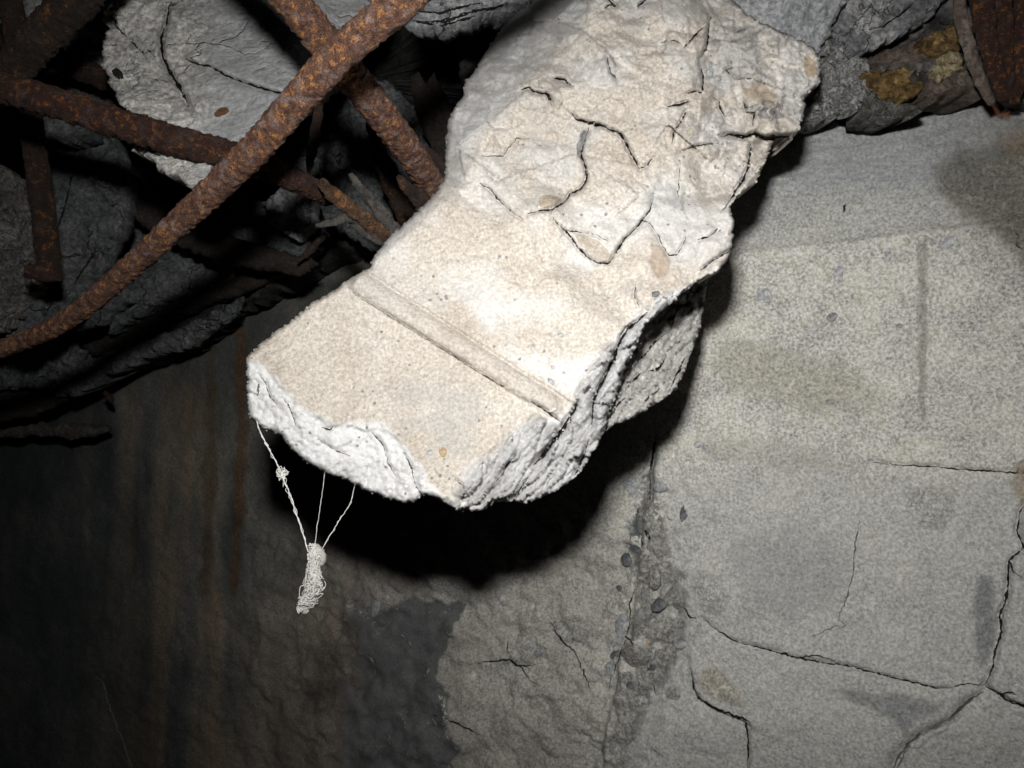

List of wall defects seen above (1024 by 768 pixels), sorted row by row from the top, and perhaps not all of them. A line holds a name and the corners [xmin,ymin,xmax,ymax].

corrosion [952,0,1024,119]
corrosion [134,175,177,231]
spalling [0,0,444,359]
corrosion [175,222,320,278]
crack [636,440,656,550]
crack [874,462,1024,474]
leakage [338,589,466,768]
crack [477,641,544,688]
crack [551,589,635,689]
crack [684,507,1024,768]